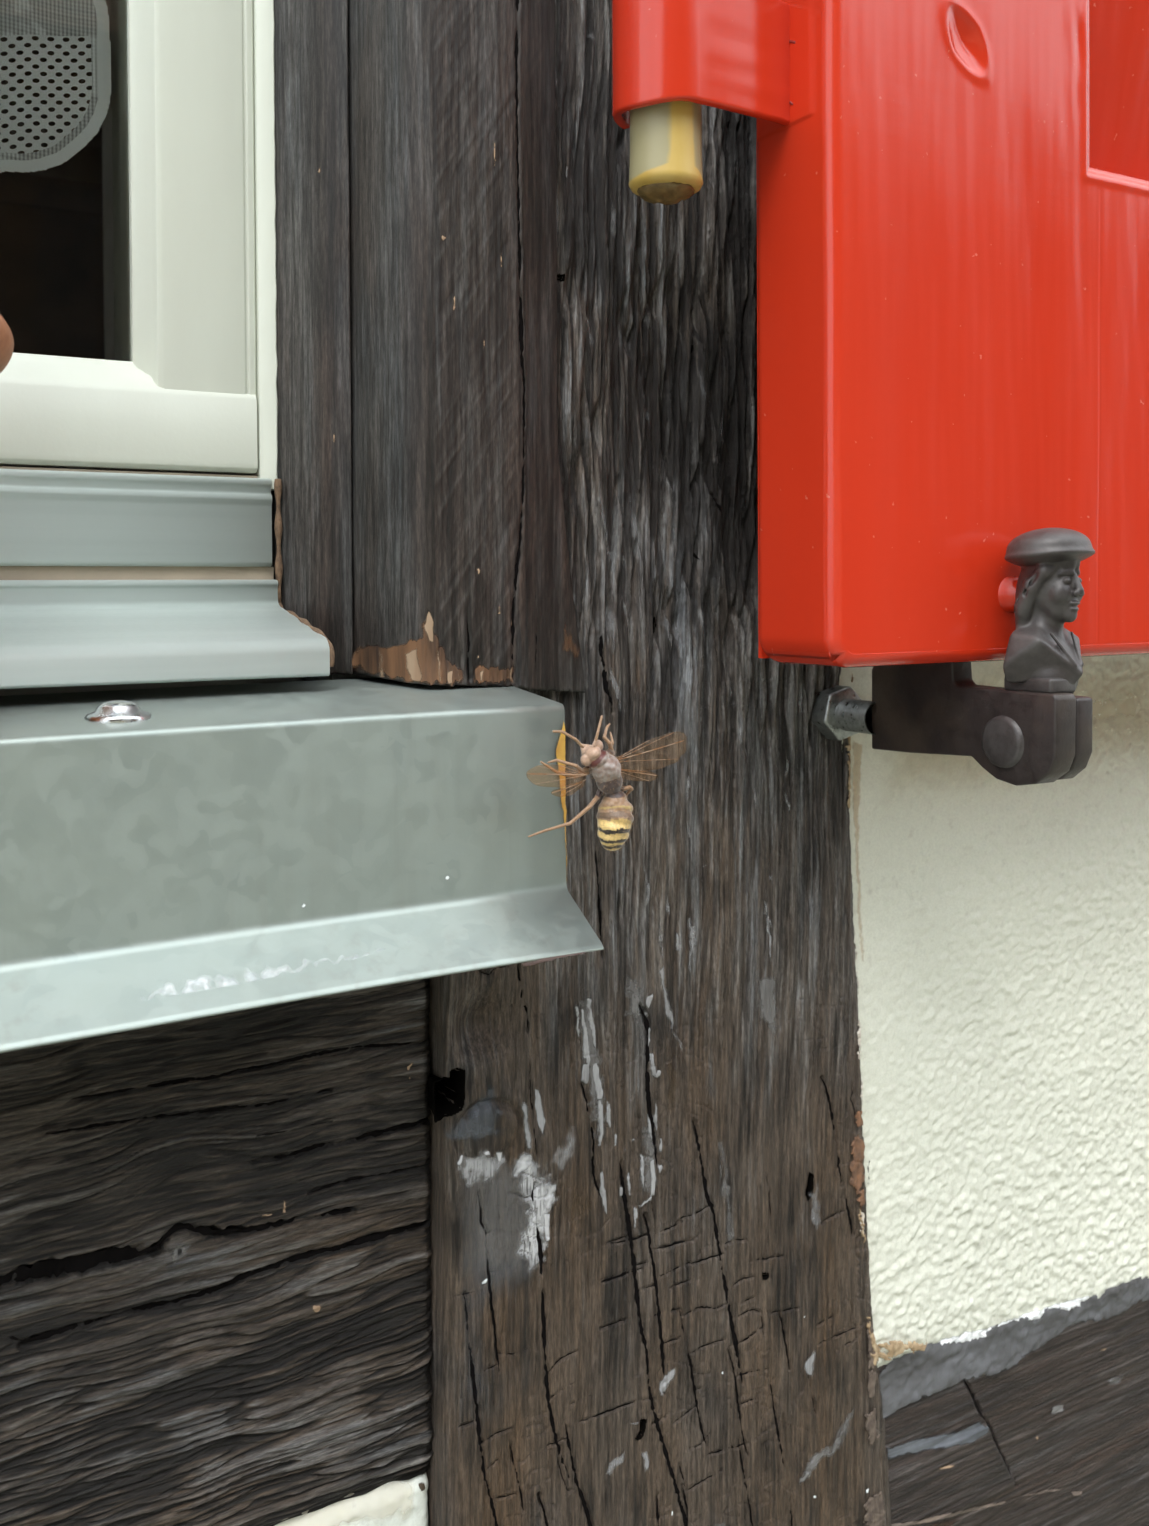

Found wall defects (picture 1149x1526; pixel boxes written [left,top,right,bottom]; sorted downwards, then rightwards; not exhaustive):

crack [46,1041,427,1159]
peeling [575,994,663,1226]
crack [0,1164,426,1343]
crack [458,1005,856,1526]